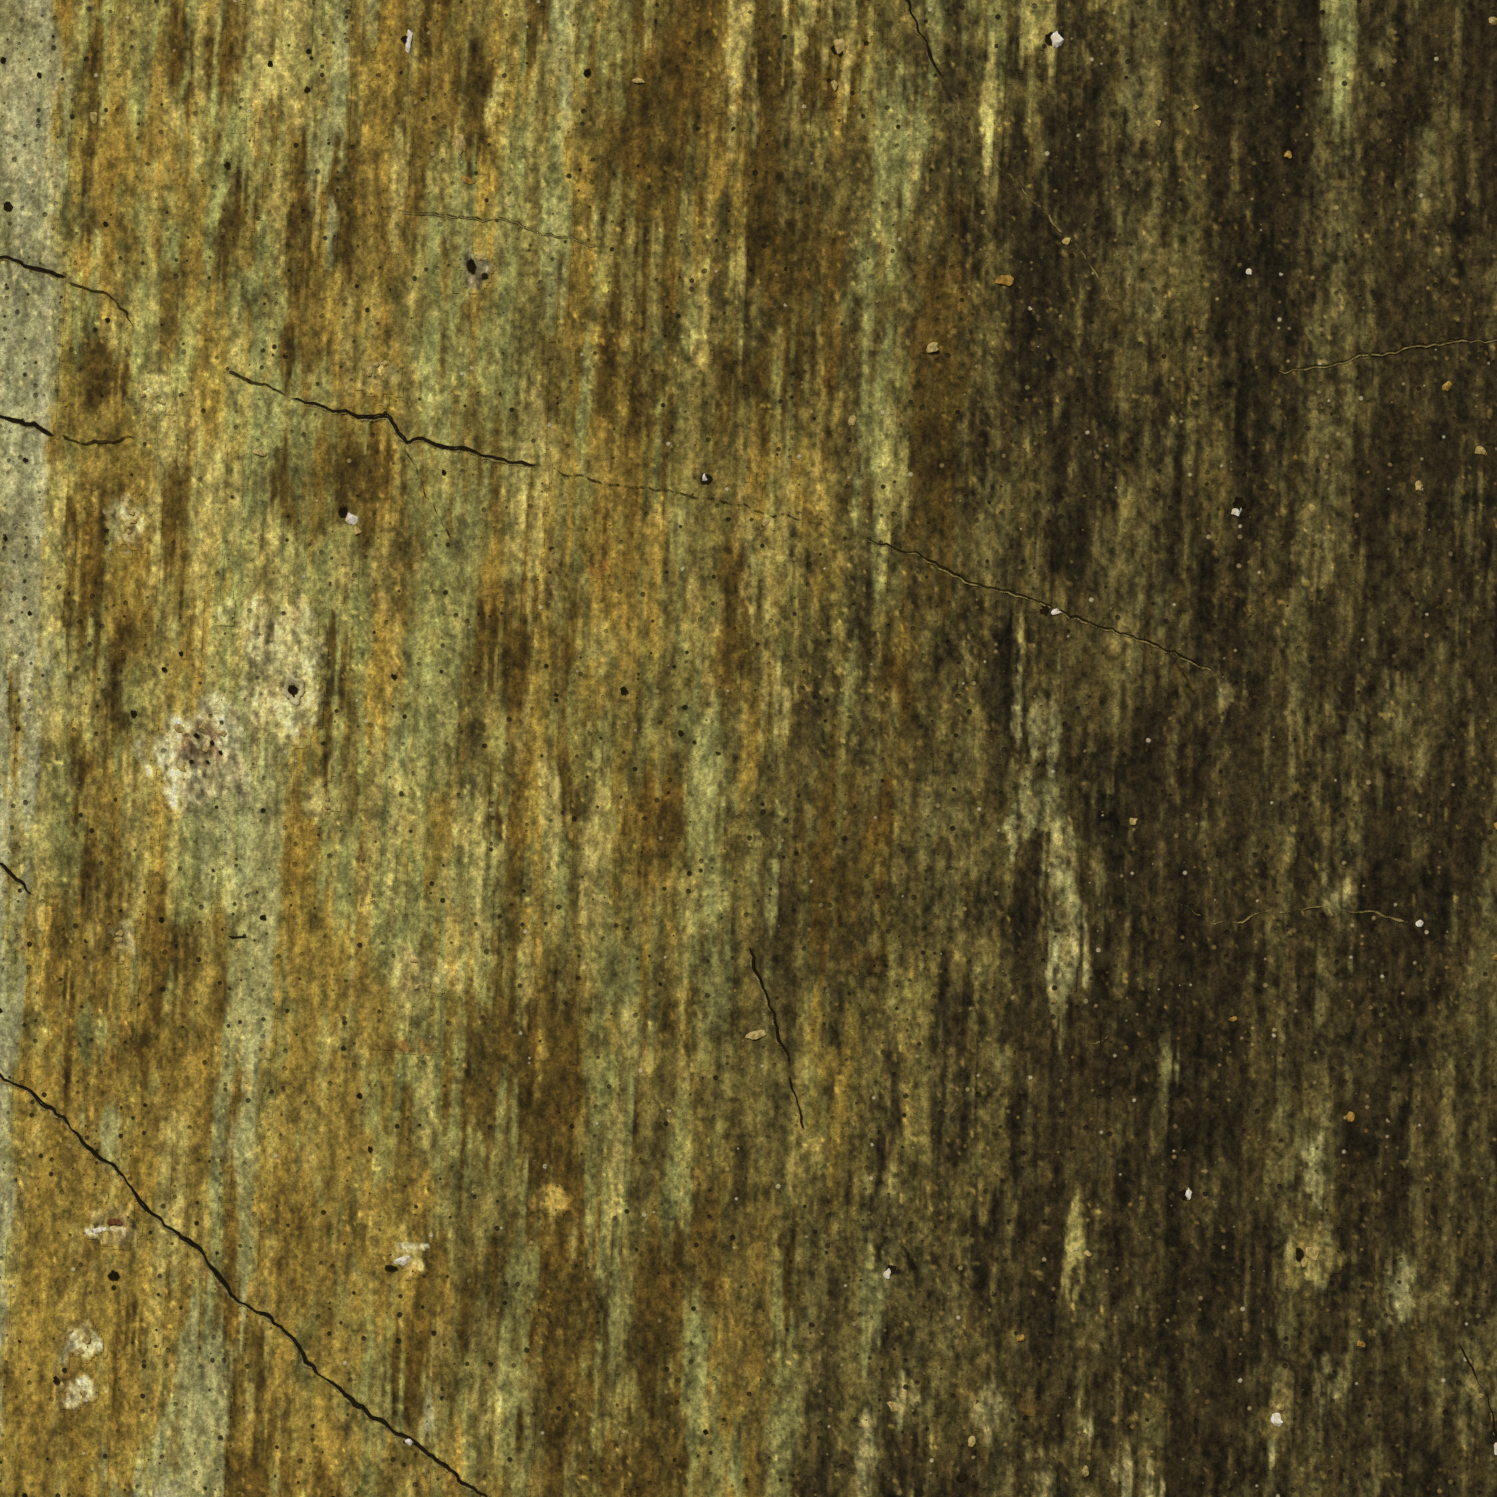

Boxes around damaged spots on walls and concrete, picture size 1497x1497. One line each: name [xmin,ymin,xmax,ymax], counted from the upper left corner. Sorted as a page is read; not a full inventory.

crack [0,255,133,326]
crack [0,415,133,445]
crack [229,370,1211,693]
crack [0,863,31,894]
crack [748,947,804,1128]
crack [0,1073,487,1497]